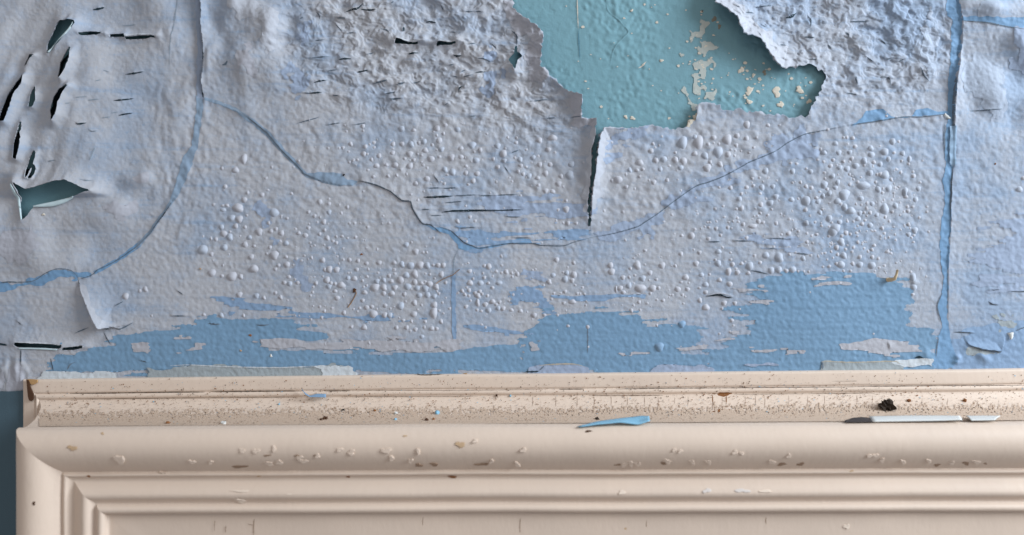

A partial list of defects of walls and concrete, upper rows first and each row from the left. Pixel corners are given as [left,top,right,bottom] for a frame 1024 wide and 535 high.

peeling [10,183,73,220]
peeling [76,284,106,332]
crack [0,0,1024,407]
peeling [504,0,826,226]